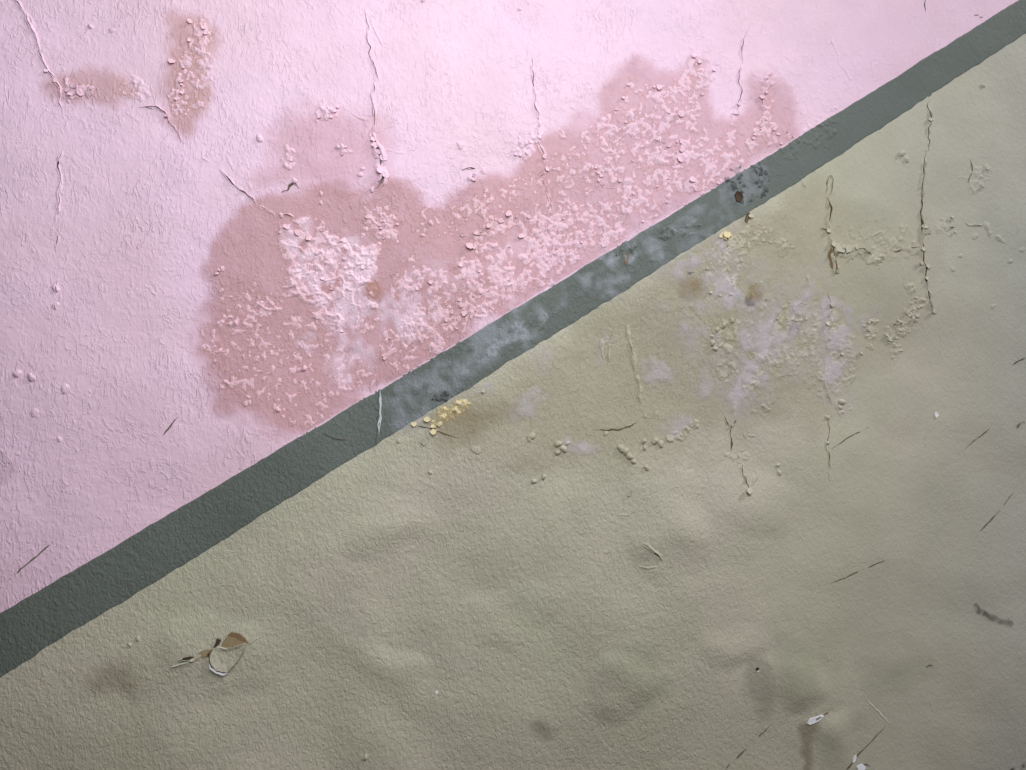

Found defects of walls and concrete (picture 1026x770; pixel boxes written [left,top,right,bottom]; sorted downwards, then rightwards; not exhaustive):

crack [12,0,64,119]
crack [351,8,406,193]
crack [530,58,553,211]
crack [733,29,767,139]
damp [204,166,541,428]
peeling [197,46,838,435]
crack [805,42,942,399]
peeling [861,276,927,359]
peeling [172,632,262,676]